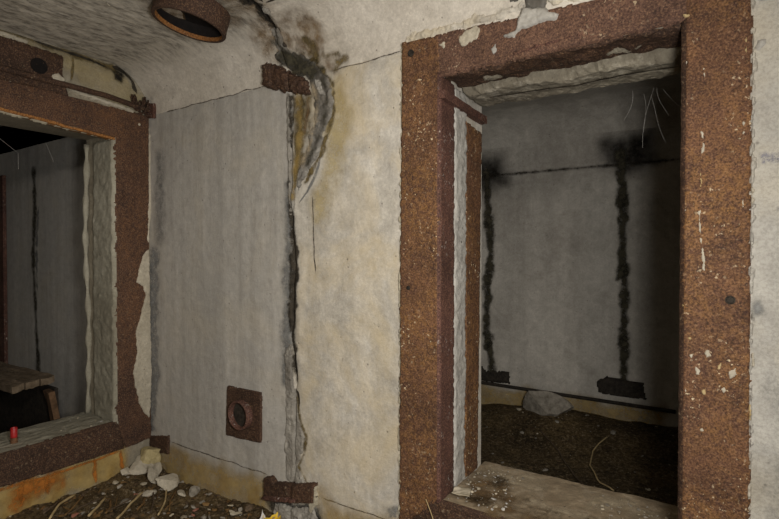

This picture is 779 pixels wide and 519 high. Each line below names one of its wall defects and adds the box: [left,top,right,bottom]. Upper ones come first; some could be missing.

damp [284,15,348,70]
peeling [133,128,152,417]
crack [282,96,320,415]